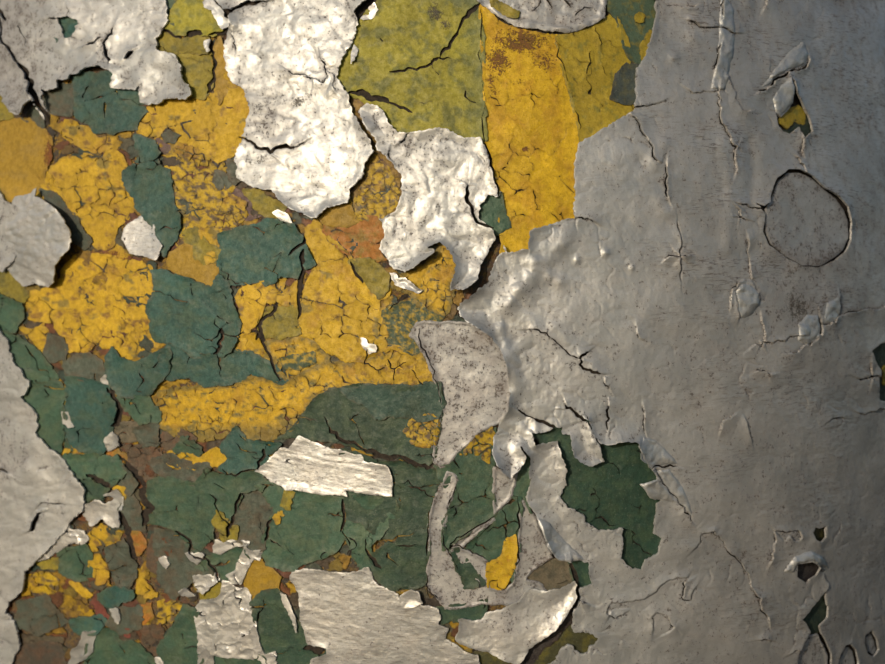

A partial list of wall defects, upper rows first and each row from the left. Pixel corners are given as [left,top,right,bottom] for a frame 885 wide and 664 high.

crack [632,104,668,197]
crack [717,96,736,162]
peeling [777,105,811,141]
peeling [0,0,661,664]
peeling [872,343,885,401]
peeling [814,527,825,542]
peeling [797,562,819,582]
peeling [798,594,828,664]